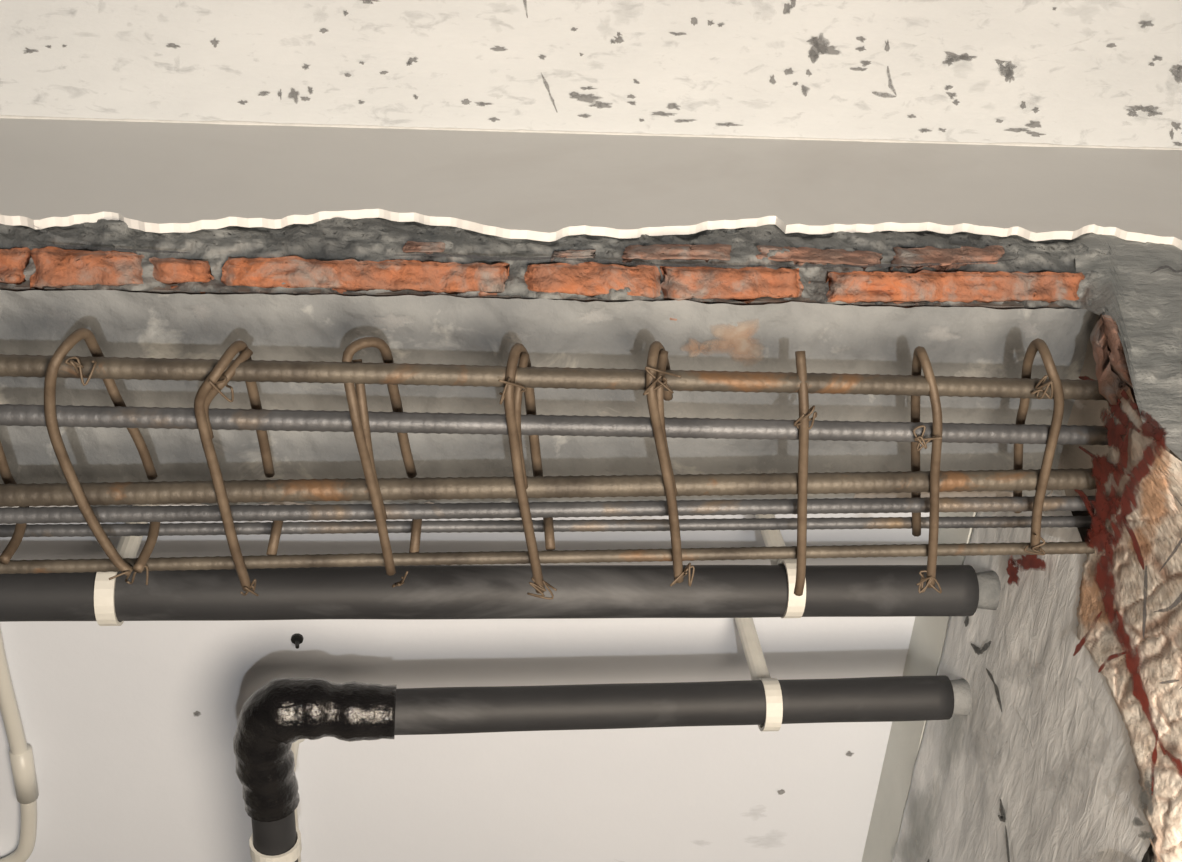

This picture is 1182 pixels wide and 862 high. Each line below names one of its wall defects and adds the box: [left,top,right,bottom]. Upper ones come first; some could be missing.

spalling [0,217,1182,862]
corrosion [1006,555,1046,585]
corrosion [1073,390,1182,795]